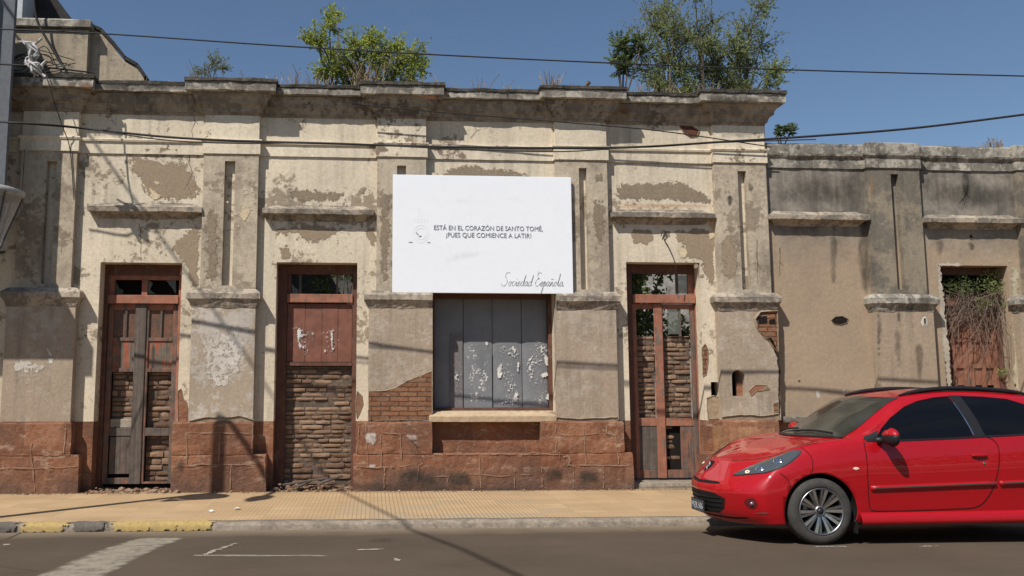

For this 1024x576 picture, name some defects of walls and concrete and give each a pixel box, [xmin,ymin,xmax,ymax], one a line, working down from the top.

peeling [119,145,201,201]
peeling [290,189,344,206]
peeling [165,209,223,288]
peeling [616,181,740,283]
spalling [753,310,780,353]
peeling [14,360,45,373]
spalling [355,371,432,422]
peeling [455,341,549,405]